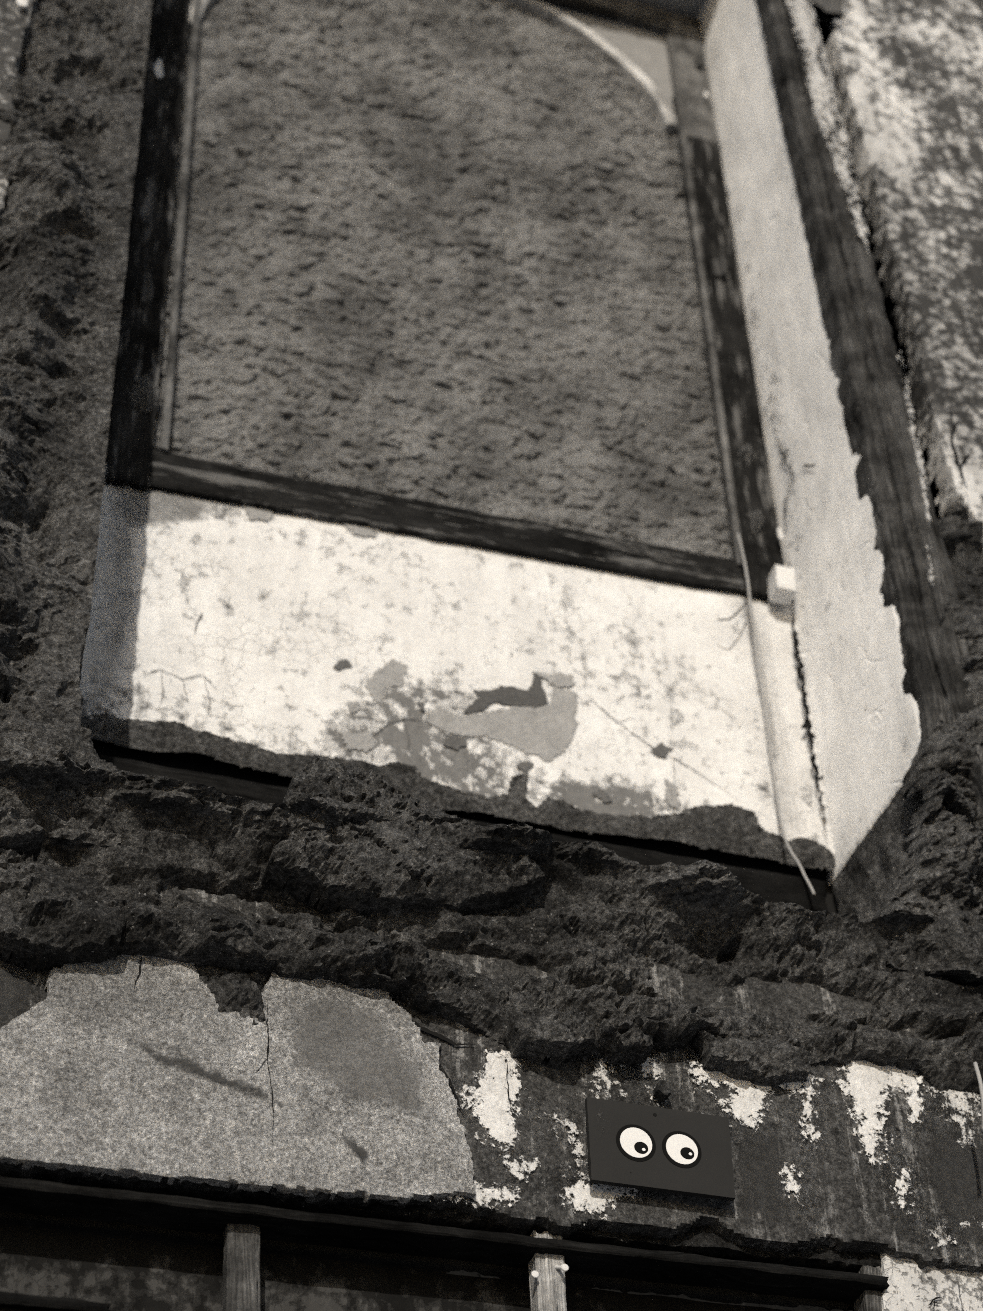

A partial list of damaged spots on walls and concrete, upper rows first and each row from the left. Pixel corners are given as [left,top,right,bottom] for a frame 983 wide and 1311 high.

flaking render [970,0,983,26]
peeling [786,0,869,252]
flaking render [0,0,836,871]
flaking render [872,380,983,986]
crack [256,998,274,1139]
flaking render [34,1049,539,1233]
peeling [582,1054,627,1099]
peeling [640,1054,664,1107]
flaking render [544,1112,882,1273]
peeling [688,1060,981,1214]
peeling [922,1221,983,1249]